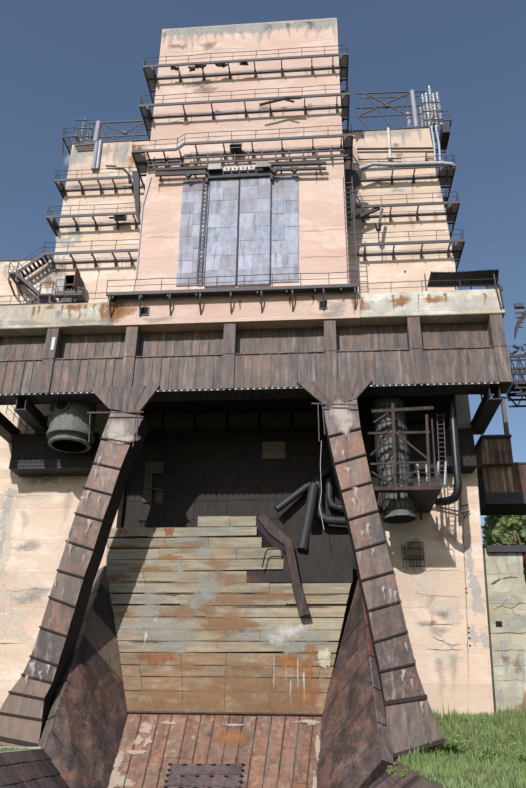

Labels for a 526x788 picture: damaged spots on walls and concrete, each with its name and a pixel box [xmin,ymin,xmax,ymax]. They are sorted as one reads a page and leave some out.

water stain [163,20,335,48]
corrosion [32,303,133,321]
corrosion [392,293,447,308]
corrosion [166,592,290,636]
crack [418,514,469,670]
crack [495,599,525,651]
corrosion [242,647,318,712]